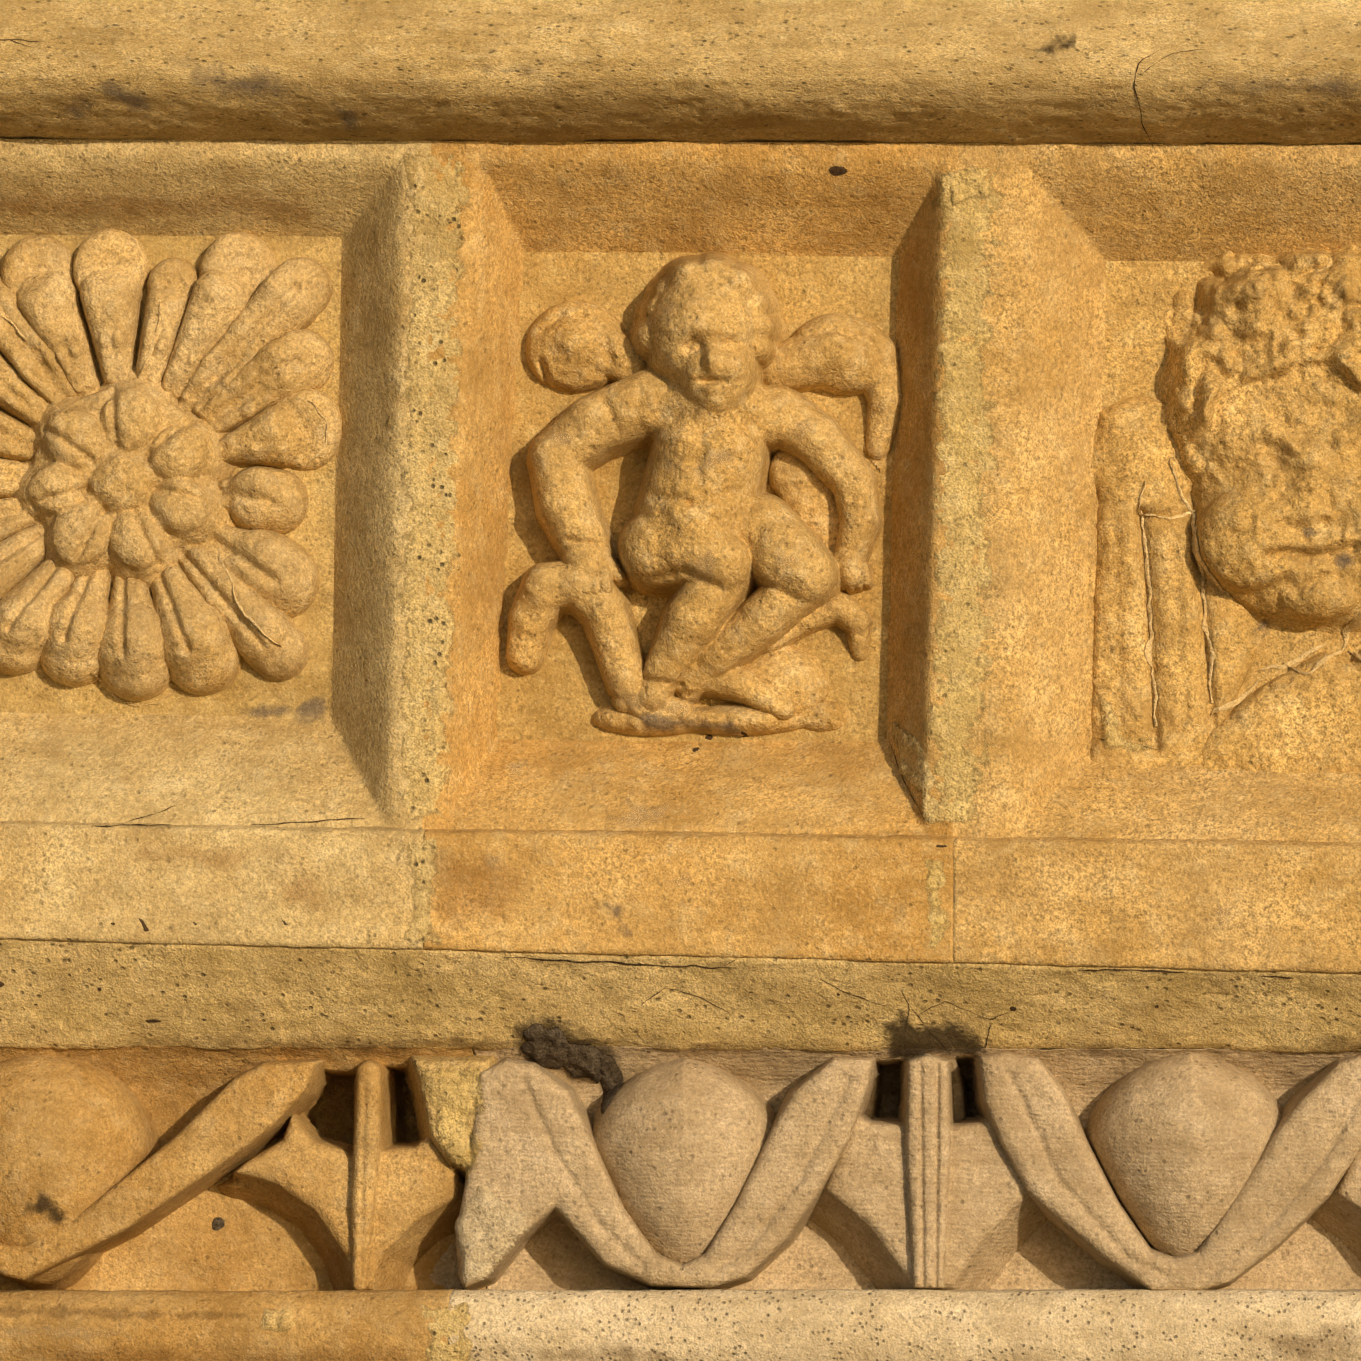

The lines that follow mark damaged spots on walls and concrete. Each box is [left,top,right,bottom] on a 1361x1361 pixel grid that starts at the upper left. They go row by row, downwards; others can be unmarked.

crack [1133,49,1207,148]
crack [504,957,738,1011]
crack [818,977,1010,1049]